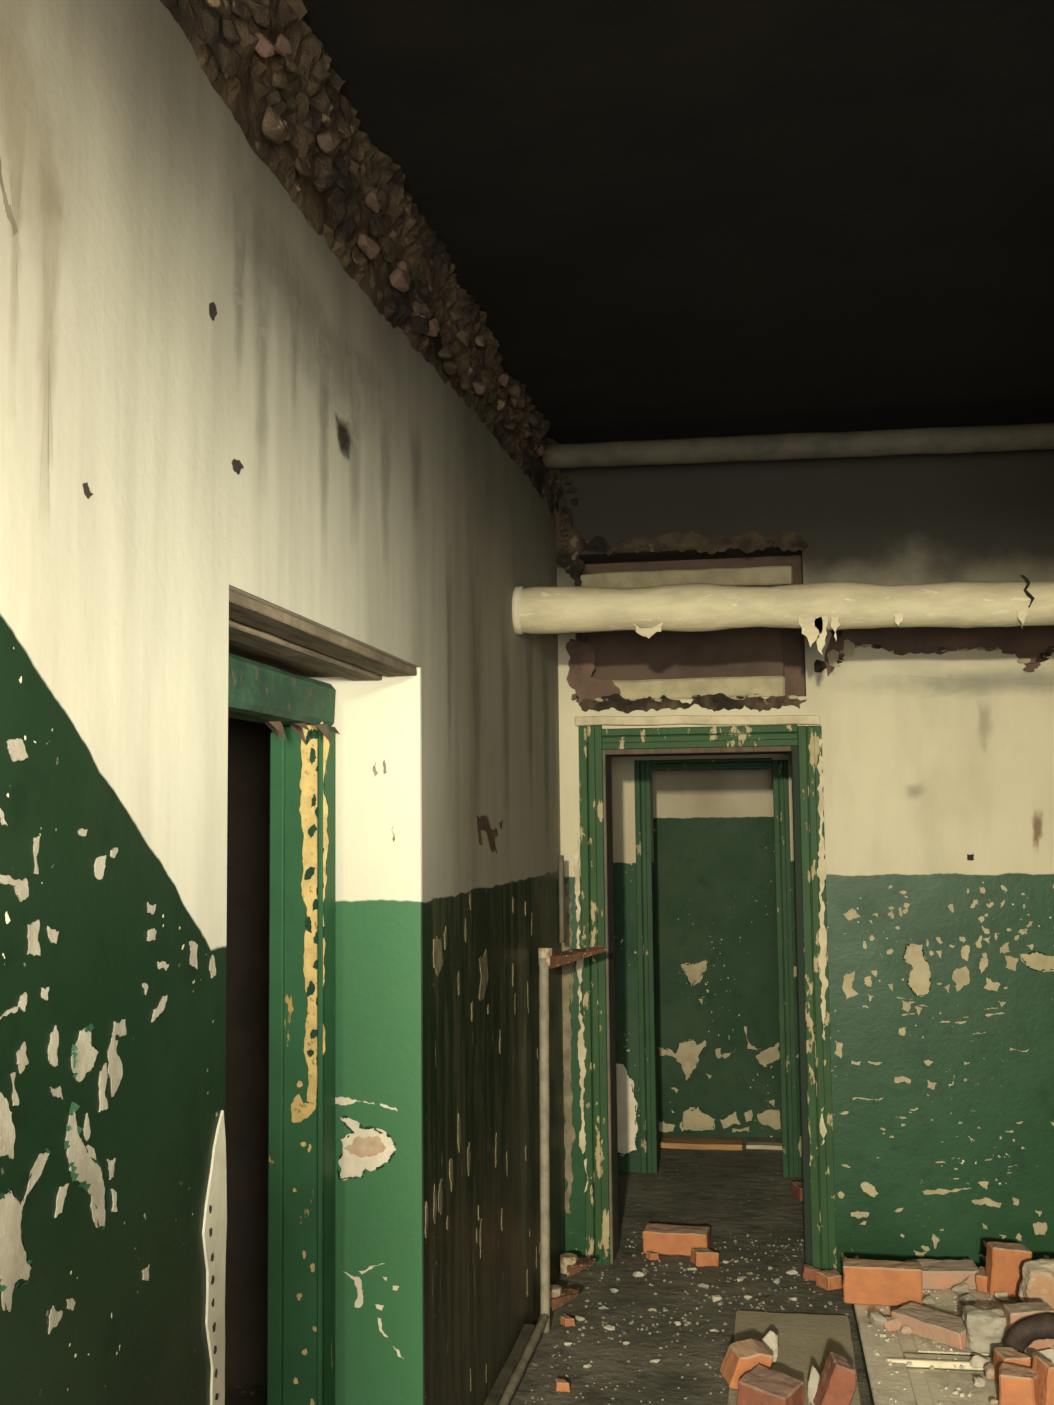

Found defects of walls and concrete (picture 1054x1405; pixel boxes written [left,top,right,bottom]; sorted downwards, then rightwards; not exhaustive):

spalling [160,0,808,586]
spalling [566,639,806,714]
peeling [0,836,40,902]
peeling [27,920,59,956]
peeling [0,1019,126,1312]
spalling [202,1110,227,1405]
peeling [291,721,330,1123]
peeling [337,1115,396,1181]
peeling [562,840,588,1213]
peeling [616,1063,638,1155]
peeling [659,1100,781,1133]
peeling [817,739,1054,1065]